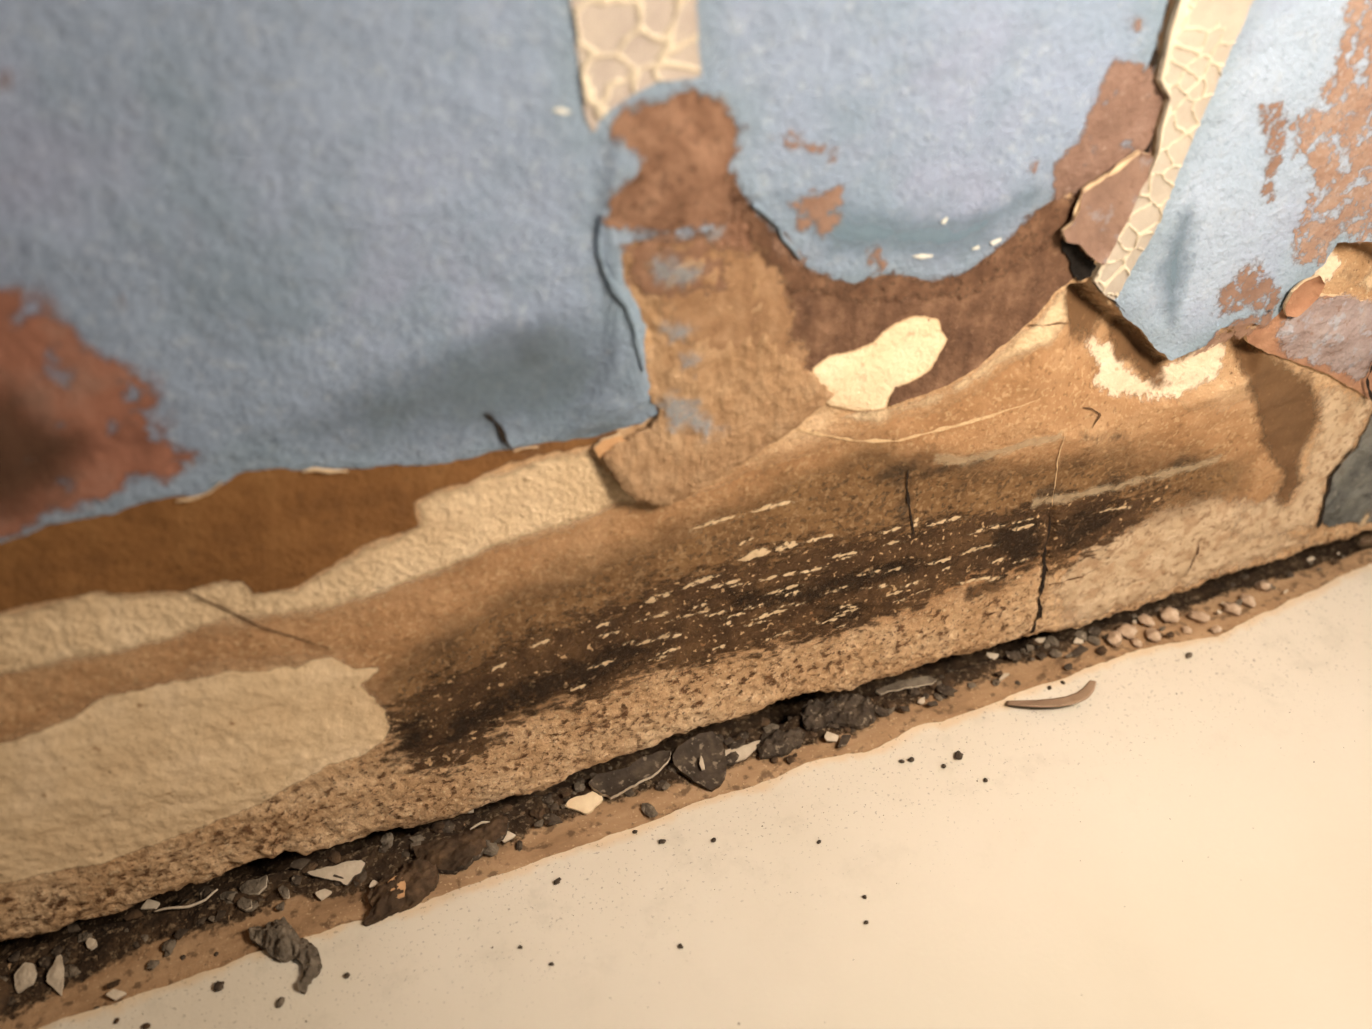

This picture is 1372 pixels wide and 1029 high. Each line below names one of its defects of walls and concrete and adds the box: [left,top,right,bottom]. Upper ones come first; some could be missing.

crack [571,0,701,132]
peeling [602,59,1282,422]
crack [1089,0,1253,312]
peeling [1258,0,1372,283]
crack [184,589,332,649]
peeling [0,288,636,673]
damp [0,314,1320,931]
crack [1030,407,1103,633]
flaking render [0,657,390,886]